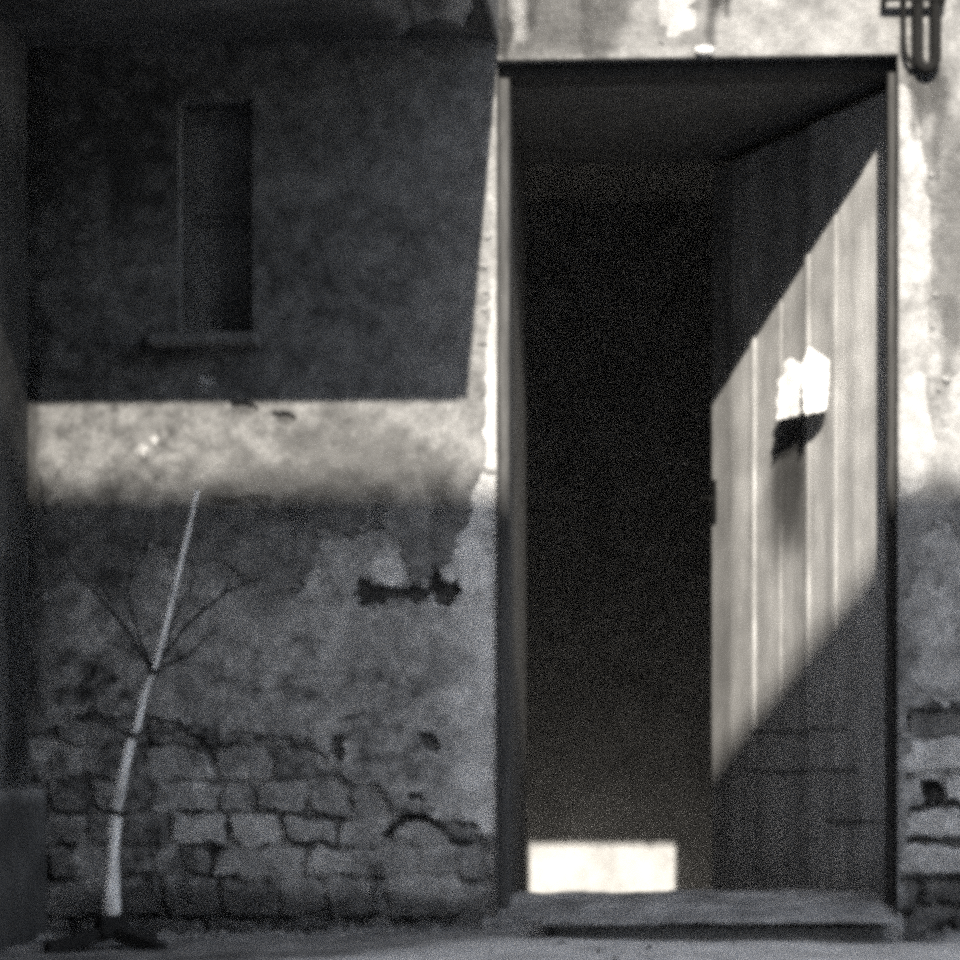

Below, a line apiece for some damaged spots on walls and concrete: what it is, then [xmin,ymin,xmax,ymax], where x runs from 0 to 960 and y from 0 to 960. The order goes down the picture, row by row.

spalling [376,0,473,36]
peeling [30,91,497,936]
spalling [898,517,960,942]